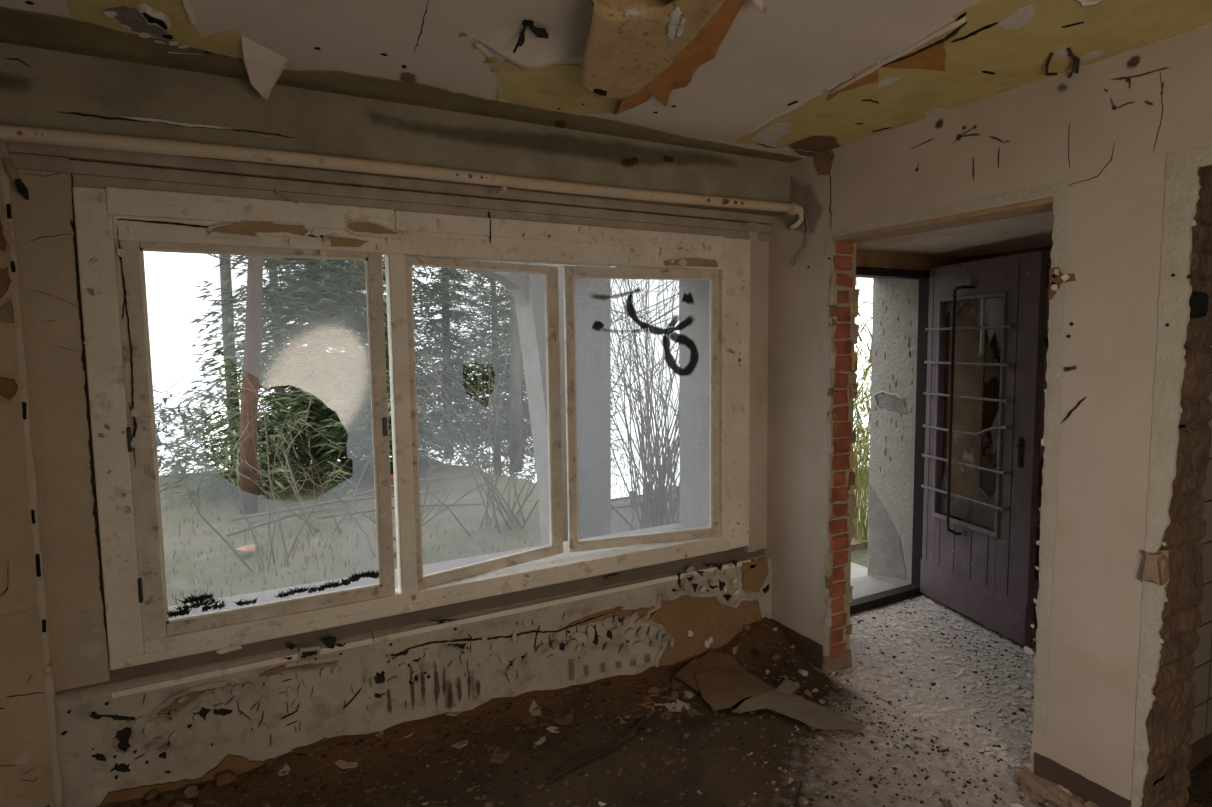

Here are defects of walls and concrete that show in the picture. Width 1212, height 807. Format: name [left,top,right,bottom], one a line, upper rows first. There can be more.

peeling [65,0,205,55]
crack [414,0,429,51]
peeling [473,42,625,115]
peeling [736,0,1212,175]
crack [1153,74,1163,152]
crack [1068,125,1115,186]
peeling [206,204,407,257]
flaking render [753,241,1100,807]
spalling [1138,166,1212,807]
spalling [551,549,770,667]
crack [5,671,44,698]
spalling [86,637,346,806]